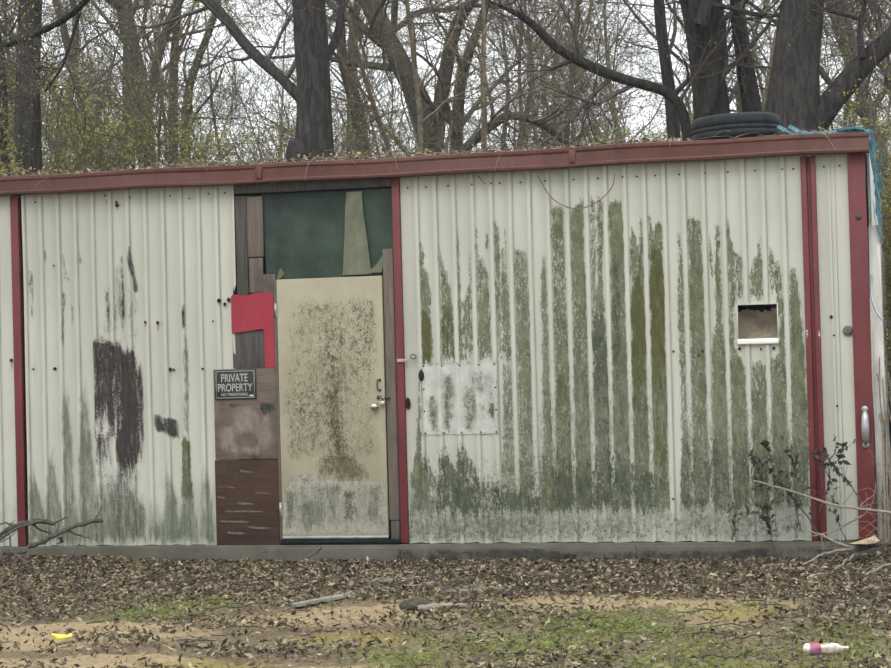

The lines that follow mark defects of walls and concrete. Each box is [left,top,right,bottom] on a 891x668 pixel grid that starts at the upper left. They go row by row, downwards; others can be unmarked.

leakage [29,400,213,544]
leakage [221,403,274,459]
leakage [288,304,381,528]
leakage [420,200,810,514]